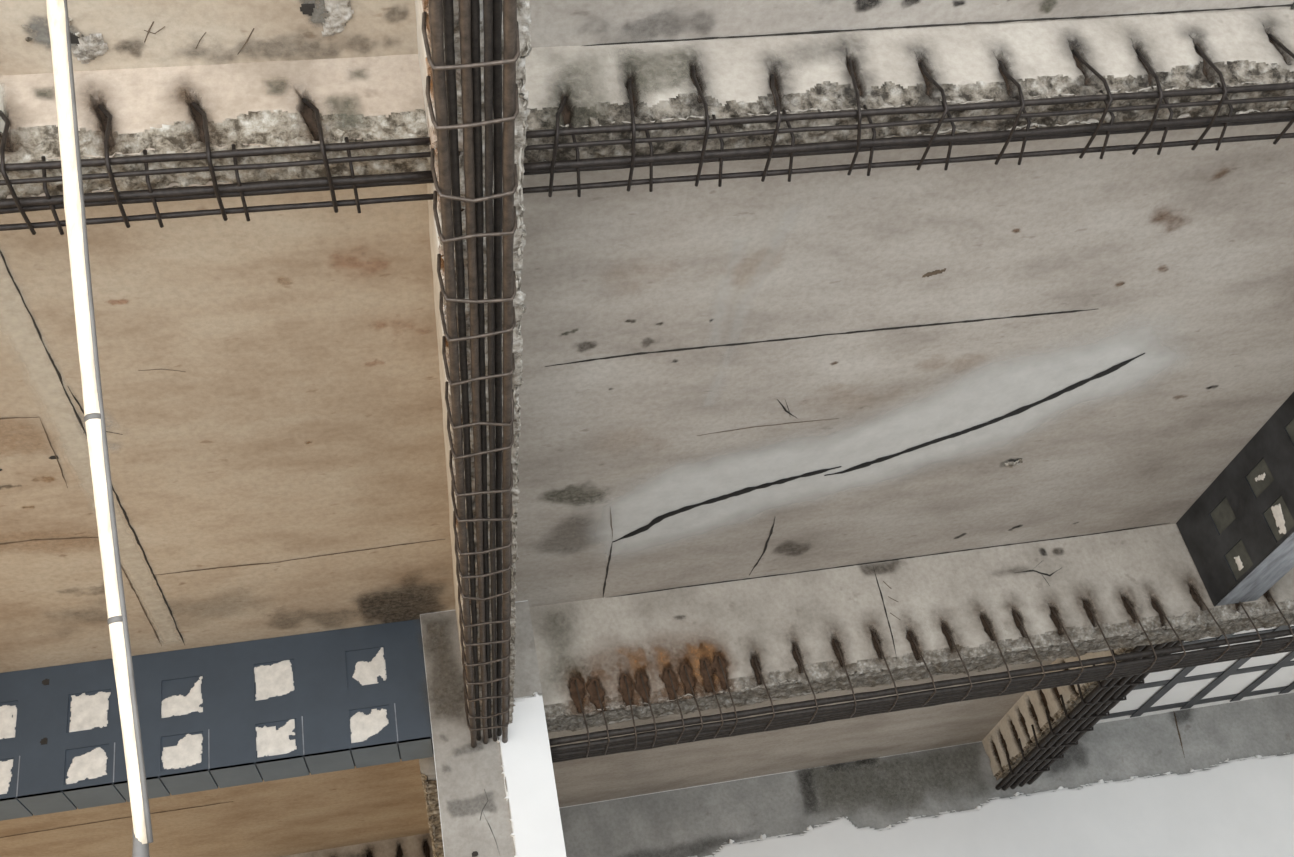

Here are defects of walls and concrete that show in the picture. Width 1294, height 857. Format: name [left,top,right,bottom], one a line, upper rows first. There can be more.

spalling [78,87,440,193]
crack [0,250,123,438]
crack [0,417,68,488]
spalling [420,0,1294,857]
crack [0,537,99,545]
crack [112,486,444,646]
crack [603,353,1168,659]
peeling [69,691,111,732]
peeling [161,734,203,769]
peeling [254,660,294,701]
peeling [256,719,297,758]
corrosion [688,644,719,681]